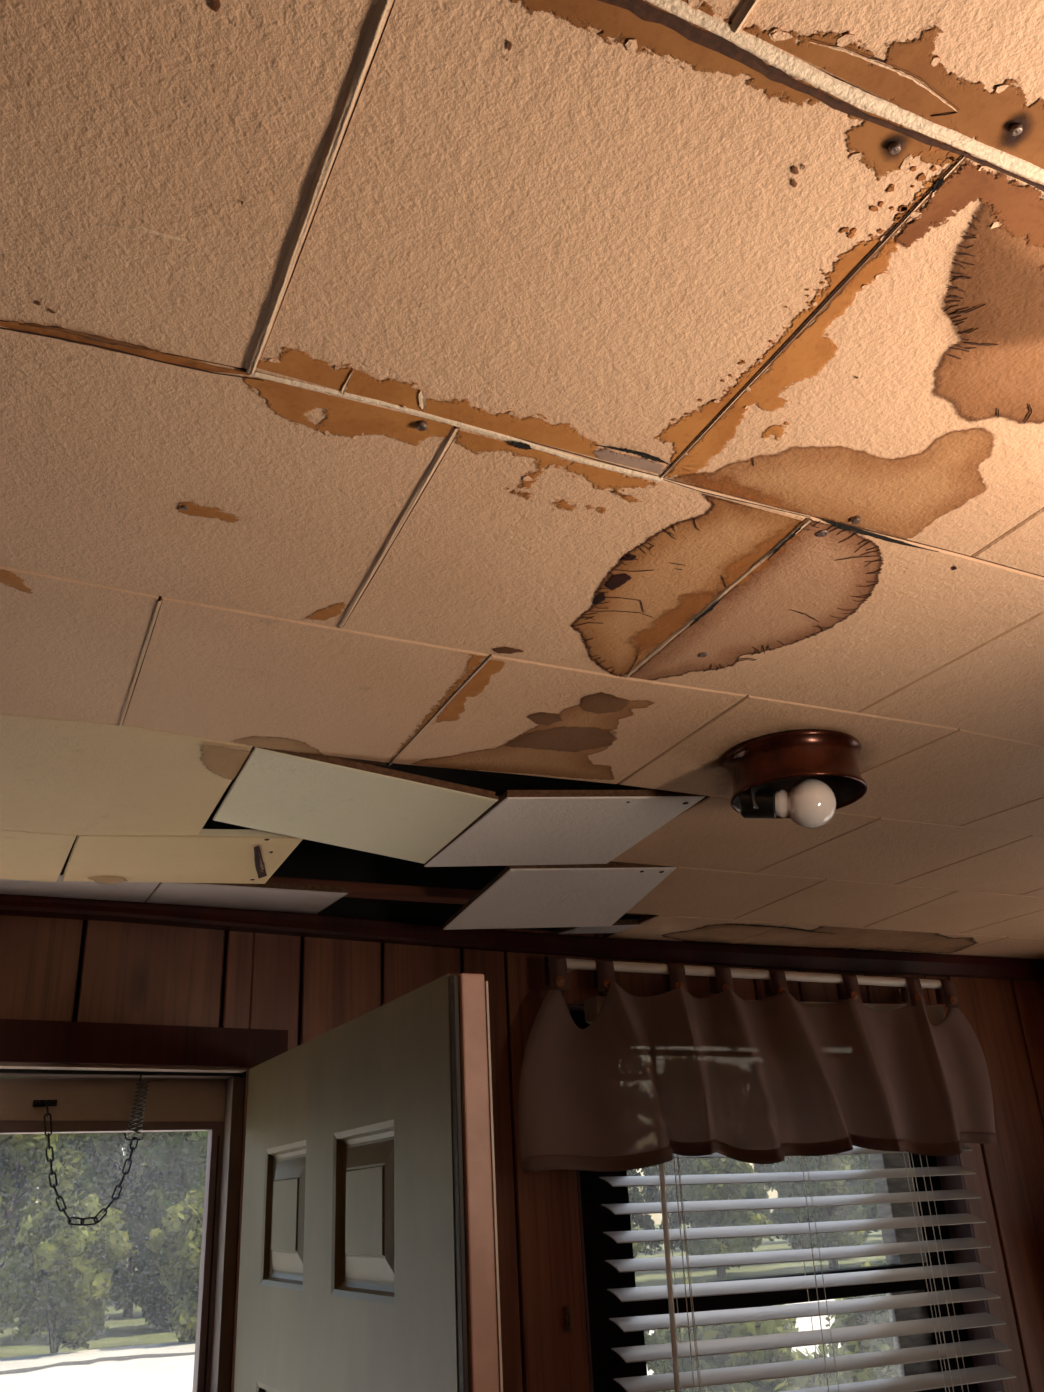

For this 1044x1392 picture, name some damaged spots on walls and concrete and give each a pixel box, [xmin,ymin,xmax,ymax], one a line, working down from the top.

peeling [244,0,1044,514]
damp [571,202,1044,680]
peeling [178,502,239,523]
peeling [392,647,524,759]
damp [412,693,654,780]